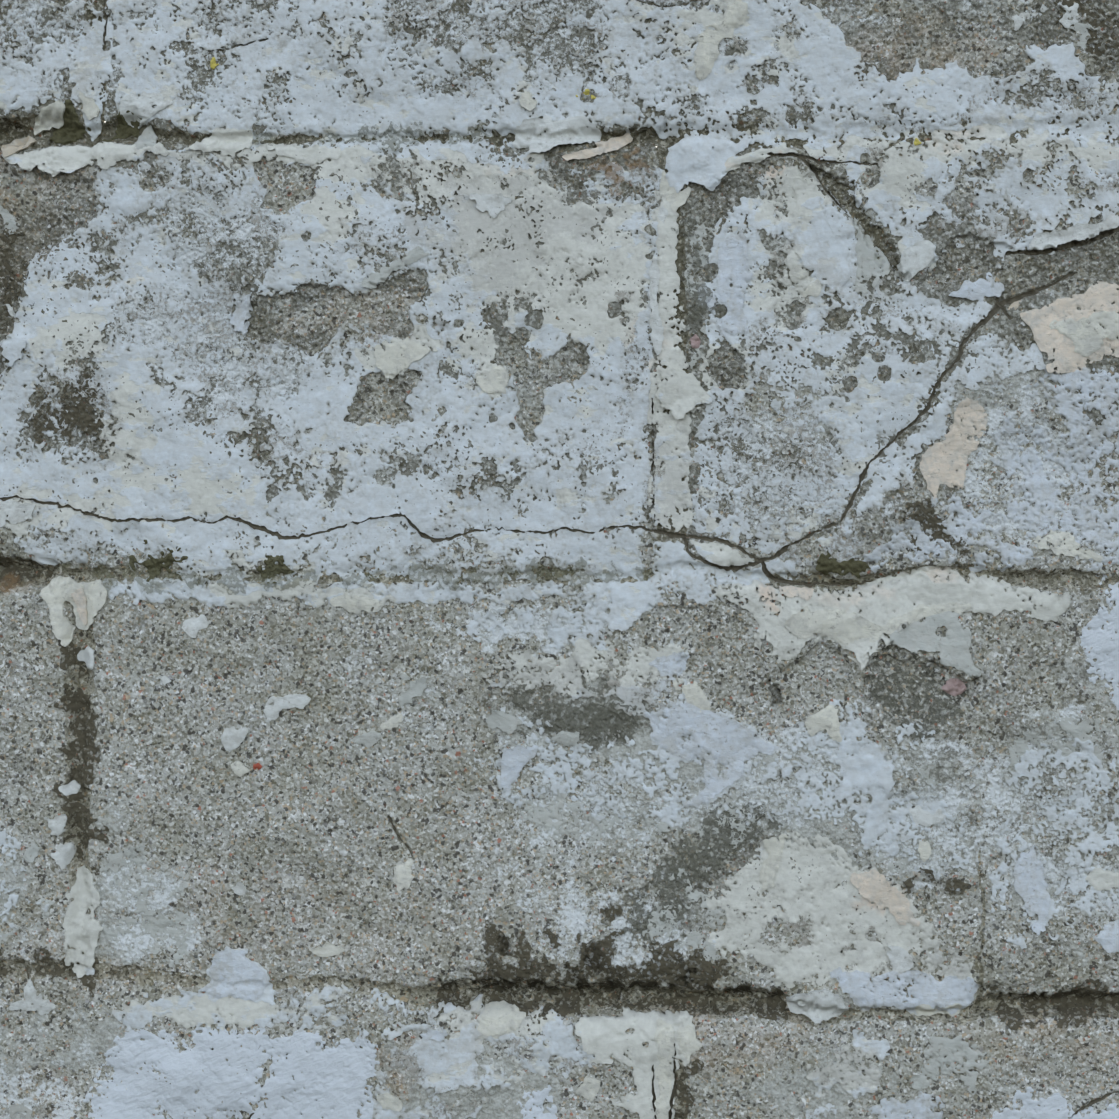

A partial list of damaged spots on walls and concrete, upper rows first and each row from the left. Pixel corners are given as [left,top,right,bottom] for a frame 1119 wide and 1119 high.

crack [768,152,877,213]
crack [0,226,1119,587]
peeling [0,0,1119,853]
damp [49,641,109,875]
peeling [393,858,414,891]
damp [467,802,793,1003]
peeling [981,713,1119,953]
peeling [9,979,55,1015]
peeling [83,946,702,1119]
peeling [786,988,849,1024]
peeling [805,1029,989,1119]
peeling [992,1087,1119,1119]